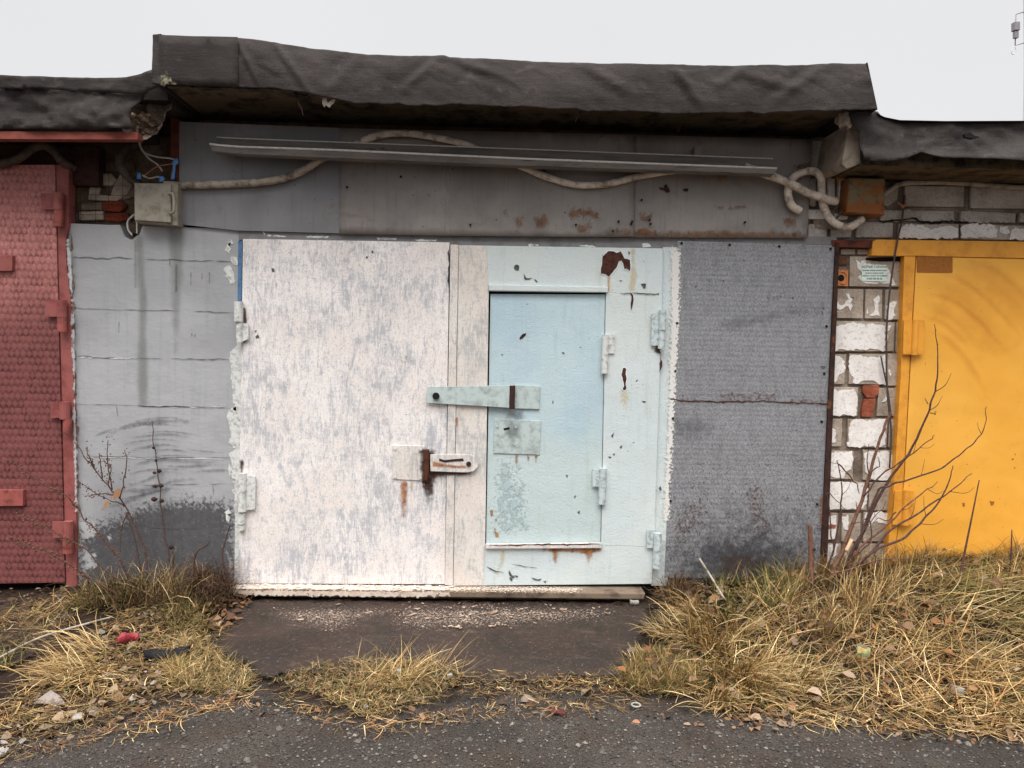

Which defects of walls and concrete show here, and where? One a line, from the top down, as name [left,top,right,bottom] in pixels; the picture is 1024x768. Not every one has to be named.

spalling [122,95,172,140]
peeling [821,259,897,561]
rust [401,449,470,507]
water stain [78,496,235,584]
rust [490,510,599,560]